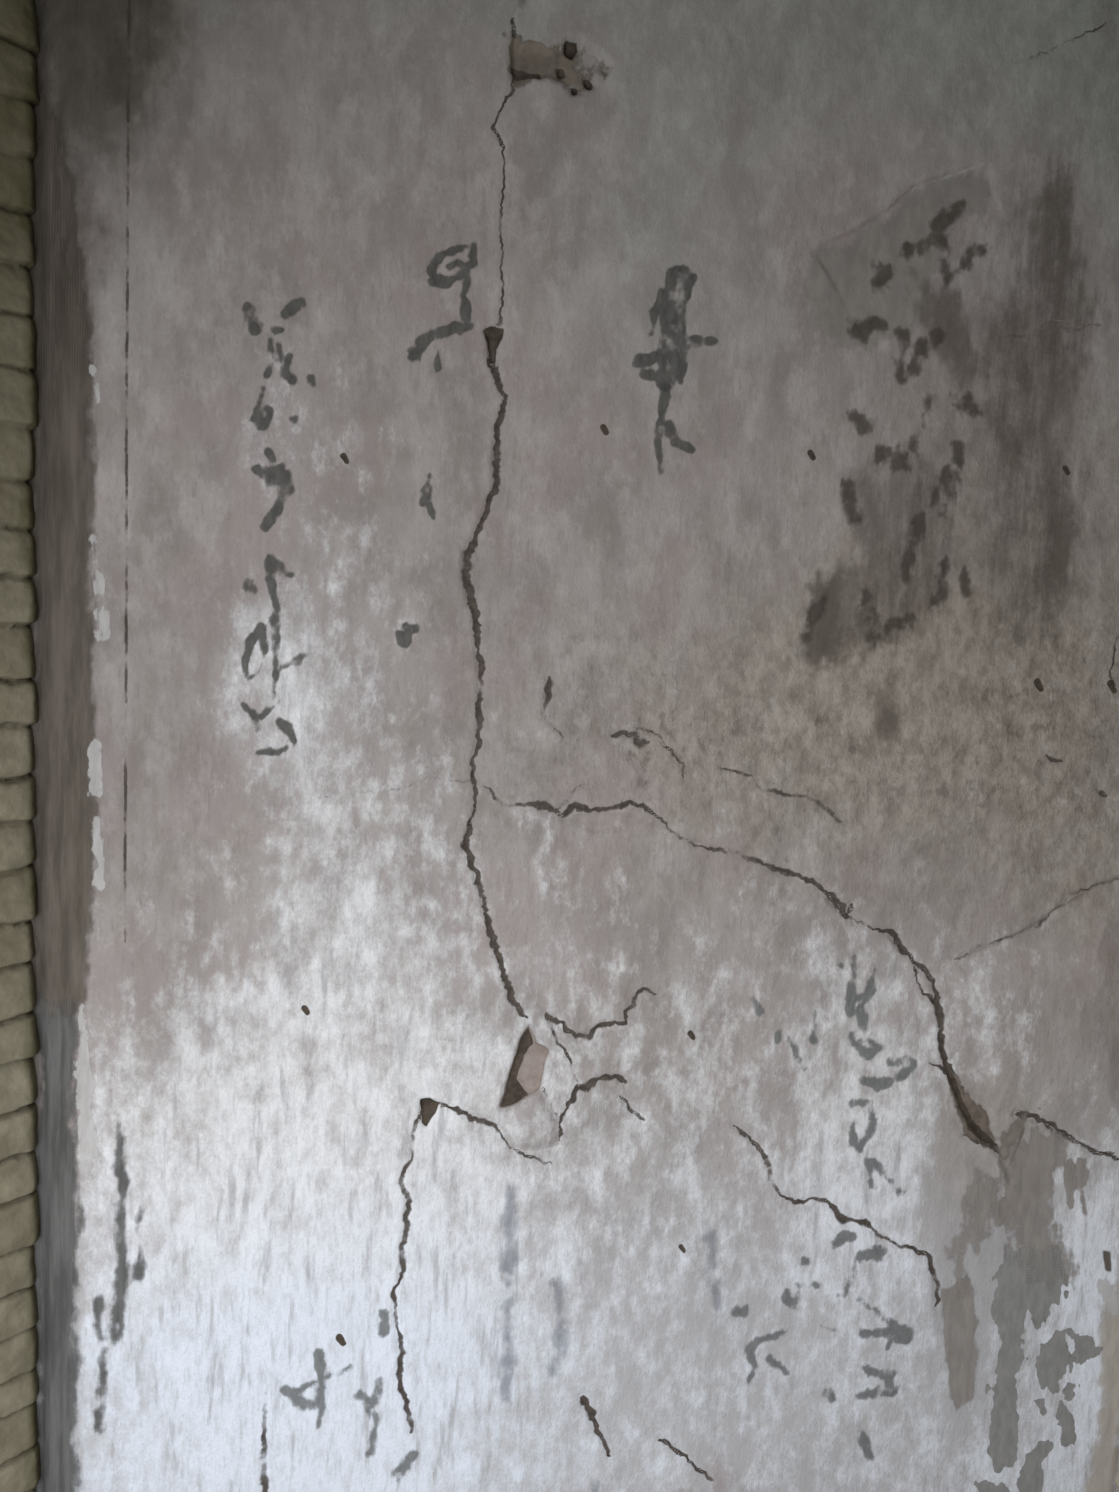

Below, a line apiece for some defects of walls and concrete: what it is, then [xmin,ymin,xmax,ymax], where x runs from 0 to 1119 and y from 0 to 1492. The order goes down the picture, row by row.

crack [510,18,518,39]
spalling [502,33,607,95]
crack [390,78,1119,1434]
spalling [499,1026,549,1108]
peeling [941,1063,1103,1492]
peeling [1103,1251,1111,1271]
crack [580,1395,610,1457]
crack [261,1428,269,1492]